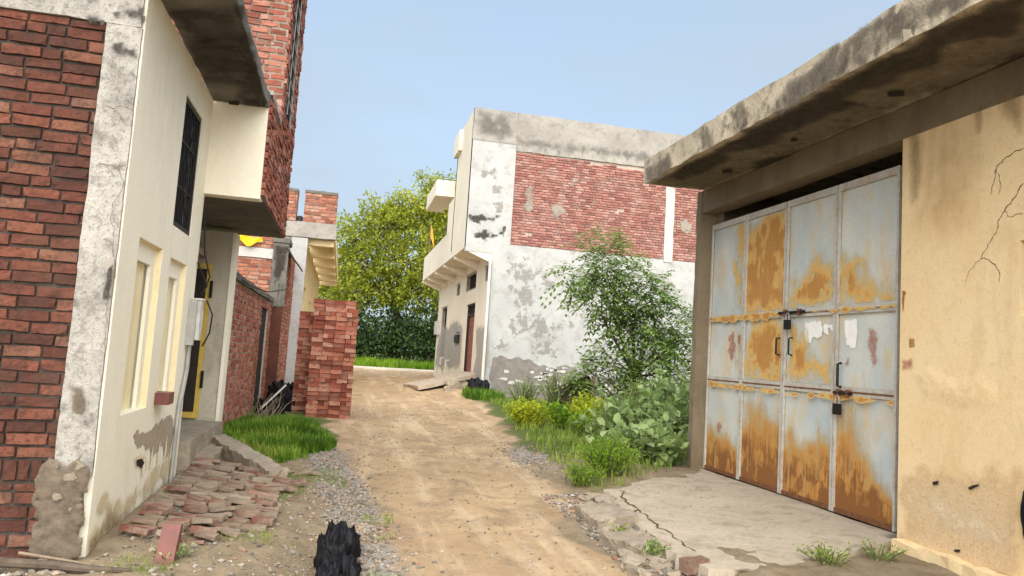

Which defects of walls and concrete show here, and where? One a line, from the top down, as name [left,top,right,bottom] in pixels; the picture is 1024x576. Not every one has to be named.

leakage [483,115,509,134]
leakage [568,0,1024,189]
mould [469,169,506,239]
crack [965,148,1024,282]
flaking render [489,152,704,401]
corrosion [706,211,906,525]
peeling [134,415,174,477]
spalling [27,457,90,561]
crack [620,490,694,550]